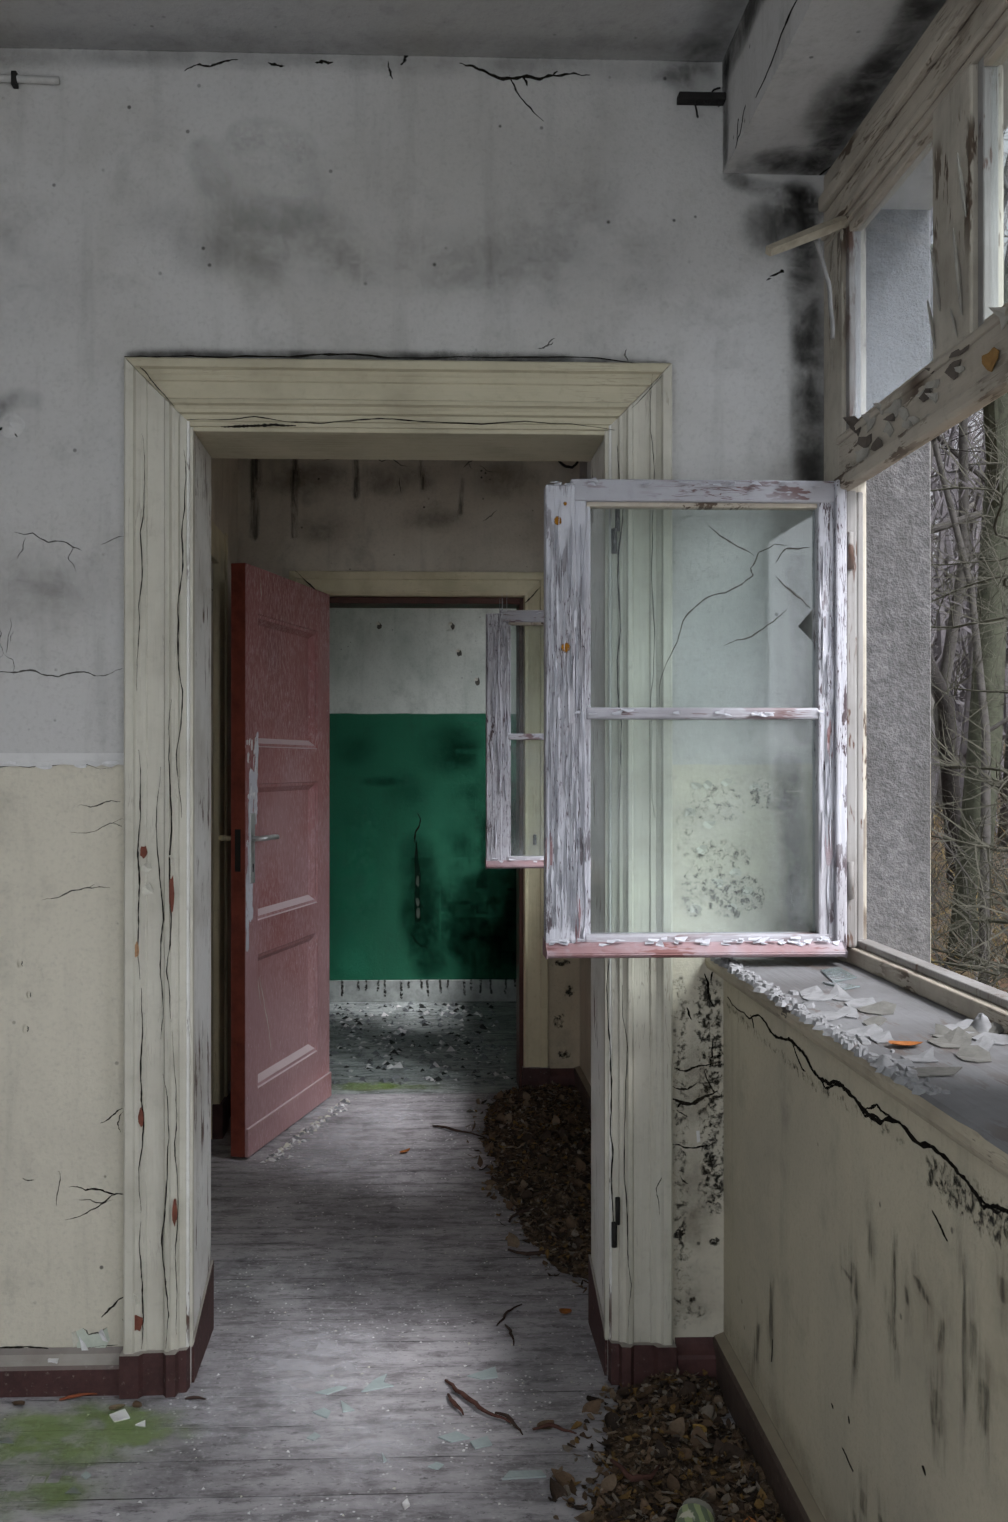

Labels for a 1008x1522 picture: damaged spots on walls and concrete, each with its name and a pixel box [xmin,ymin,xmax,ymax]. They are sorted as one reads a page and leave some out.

crack [460,63,587,121]
water stain [765,187,818,284]
water stain [794,303,824,481]
crack [15,338,668,1349]
water stain [341,803,516,999]
peeling [645,936,1008,1095]
water stain [673,977,748,1271]
crack [606,964,1008,1327]
water stain [888,1253,928,1321]
water stain [927,1159,1008,1246]